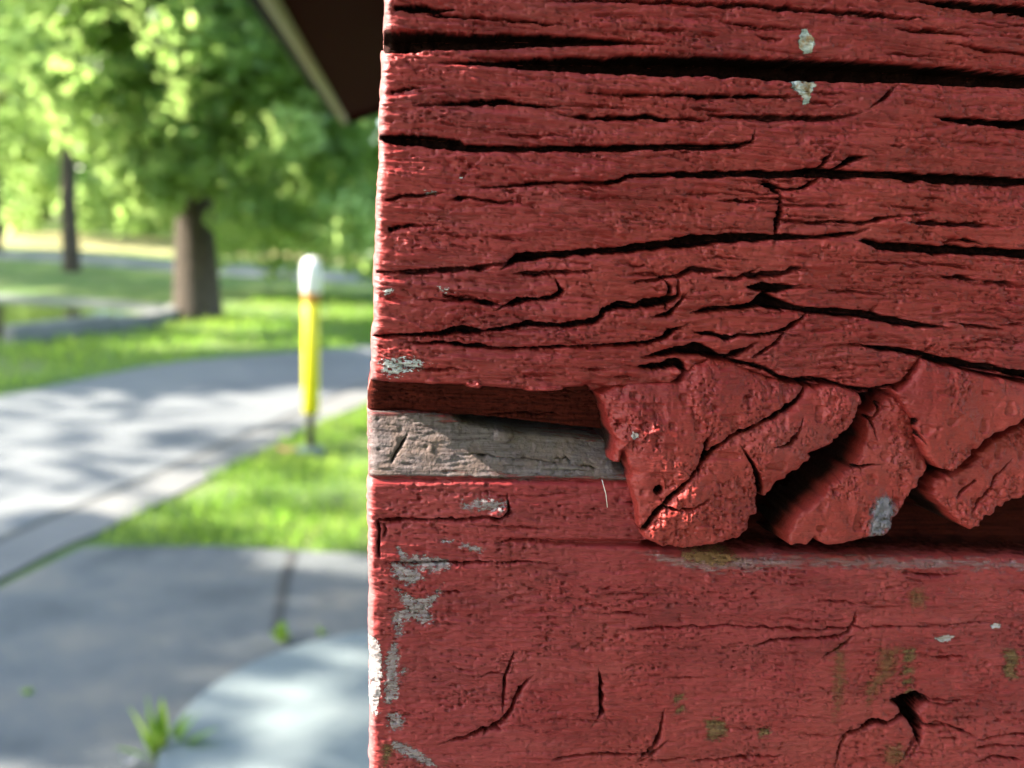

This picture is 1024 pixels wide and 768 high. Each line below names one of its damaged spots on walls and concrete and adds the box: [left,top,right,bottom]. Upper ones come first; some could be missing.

peeling [798,29,815,54]
peeling [789,81,816,105]
crack [373,6,1024,391]
peeling [378,355,433,379]
peeling [869,497,894,537]
peeling [368,546,450,766]
crack [457,665,526,737]
crack [596,674,604,712]
crack [838,690,961,748]